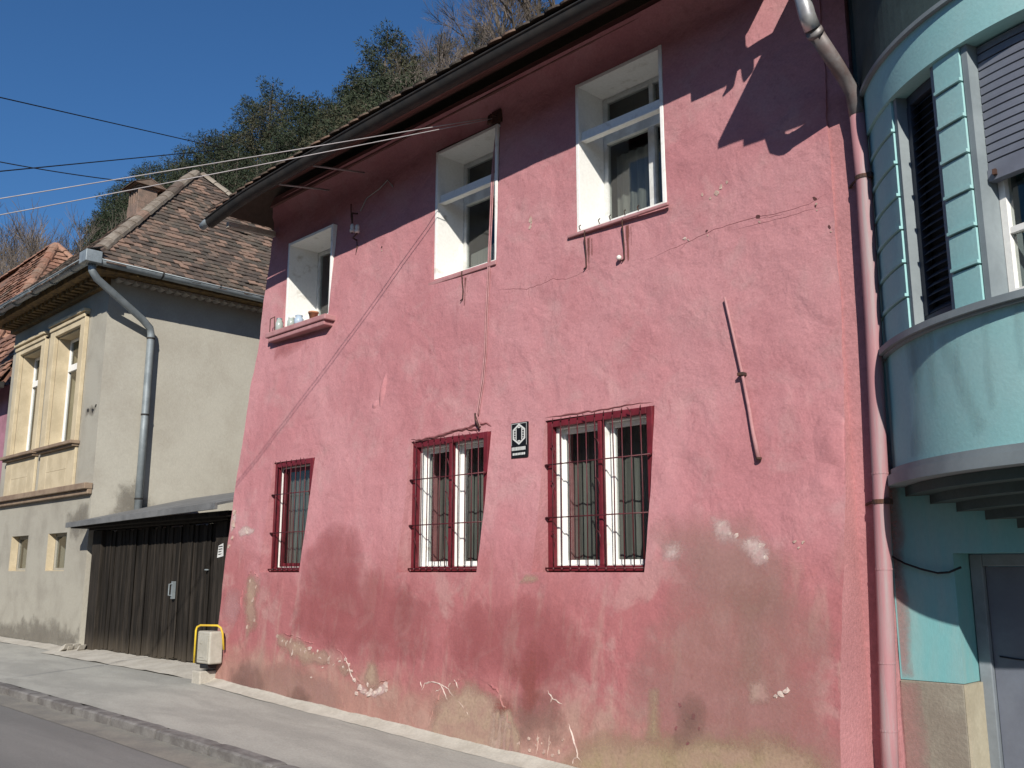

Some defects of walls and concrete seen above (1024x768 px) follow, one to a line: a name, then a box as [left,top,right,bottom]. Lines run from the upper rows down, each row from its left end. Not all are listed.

peeling [276,633,389,697]
flaking render [429,678,564,757]
water stain [491,712,512,751]
spalling [751,683,790,701]